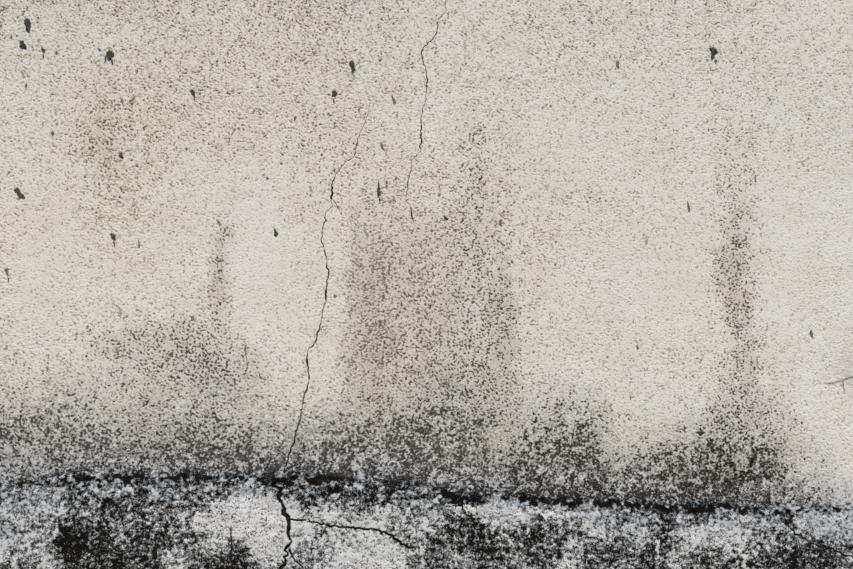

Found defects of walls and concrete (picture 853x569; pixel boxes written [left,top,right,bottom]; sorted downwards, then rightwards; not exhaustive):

crack [406,0,446,221]
crack [271,104,418,569]
water stain [0,160,853,522]